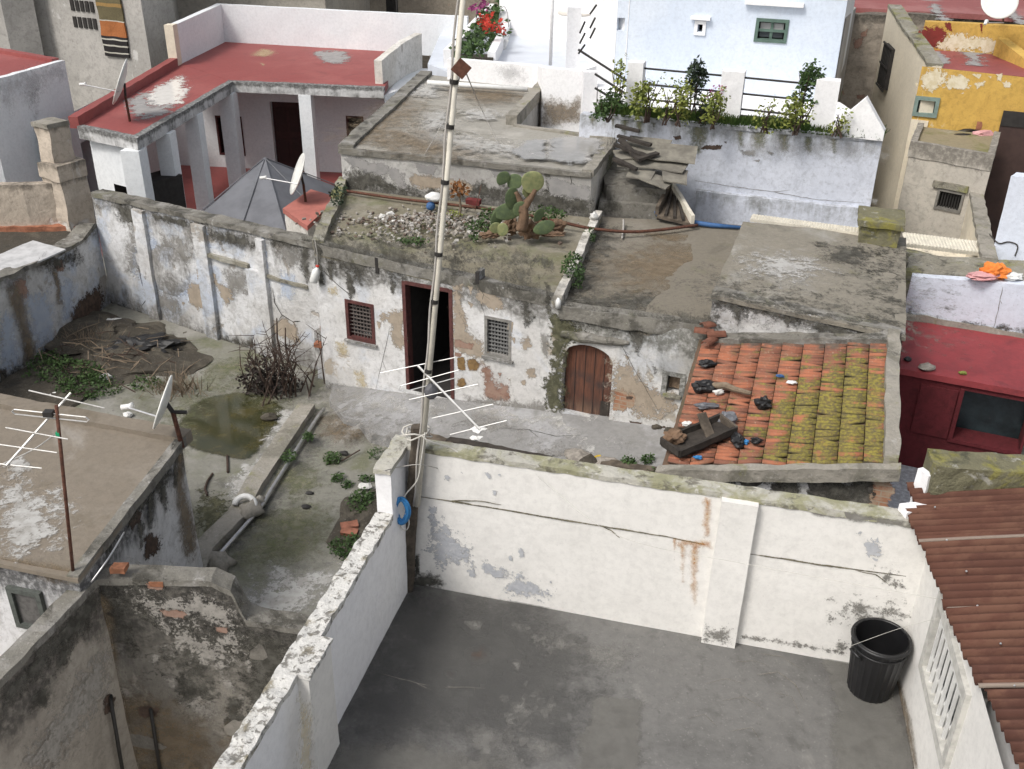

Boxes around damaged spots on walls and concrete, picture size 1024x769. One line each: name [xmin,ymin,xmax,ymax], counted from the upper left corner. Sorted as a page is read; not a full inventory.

peeling [313,50,350,64]
peeling [937,22,996,54]
peeling [916,65,1011,94]
flaking render [182,270,203,309]
flaking render [452,283,536,401]
damp [464,397,545,430]
damp [129,443,196,556]
crack [423,497,699,544]
peeling [423,506,556,601]
crack [751,554,902,584]
damp [0,558,343,769]